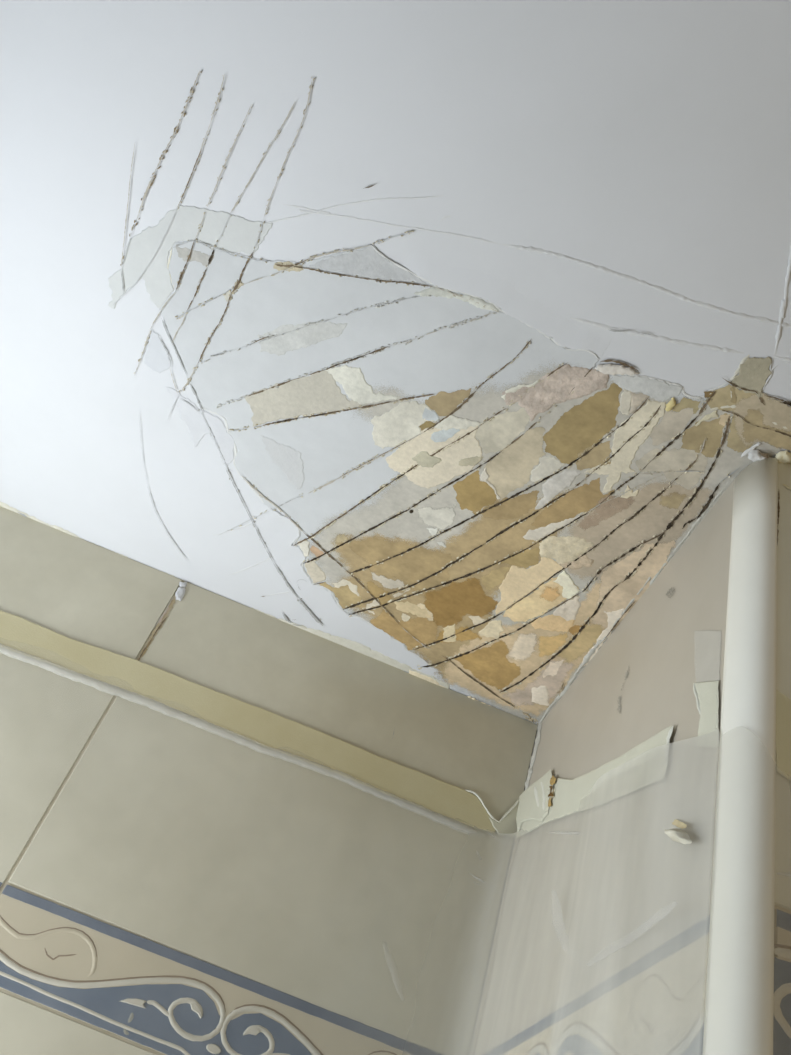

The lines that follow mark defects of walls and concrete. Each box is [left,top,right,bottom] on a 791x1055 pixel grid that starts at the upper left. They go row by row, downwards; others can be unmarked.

peeling [108,205,782,725]
crack [112,71,791,708]